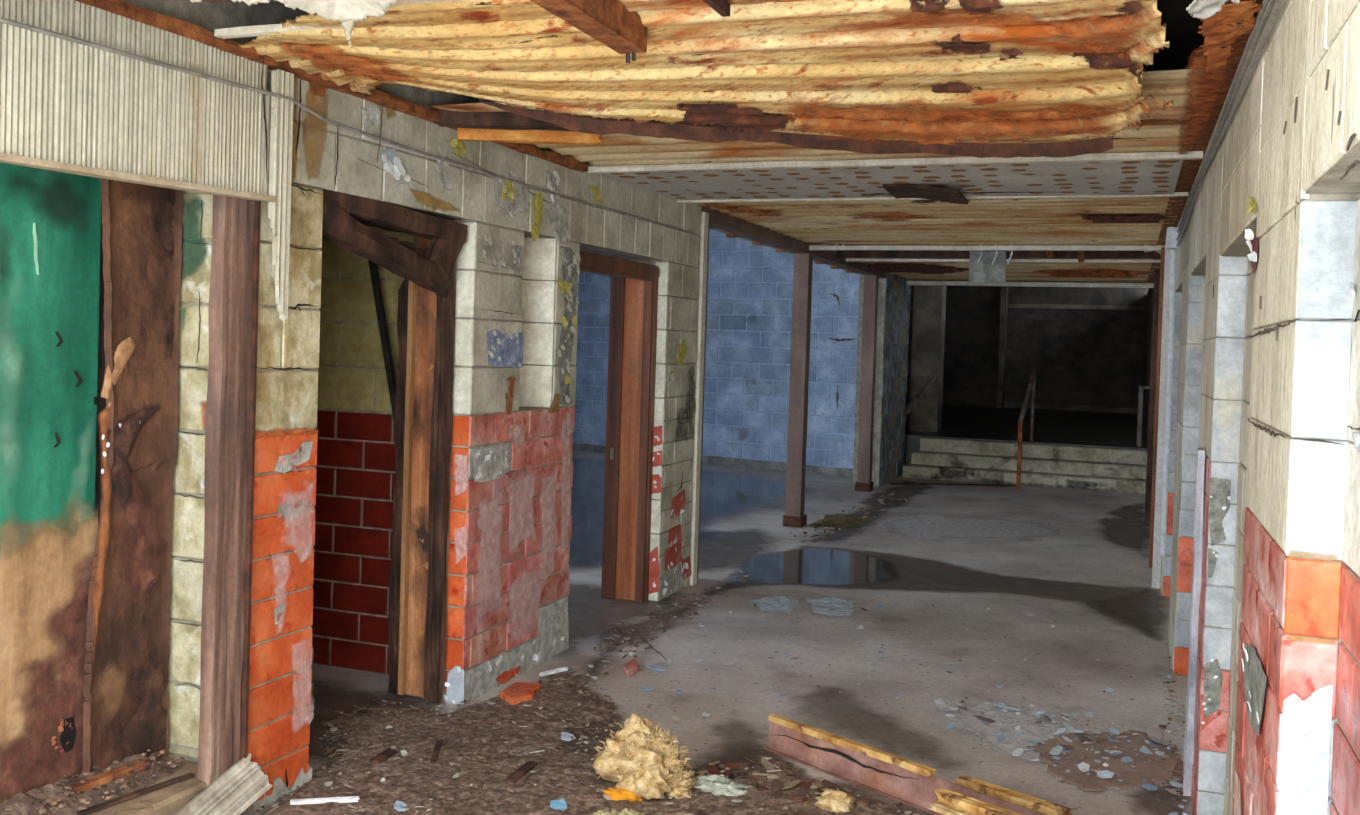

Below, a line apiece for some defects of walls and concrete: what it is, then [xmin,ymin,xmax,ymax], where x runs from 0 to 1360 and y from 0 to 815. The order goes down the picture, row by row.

rust [890,0,1148,77]
rust [281,42,411,99]
rust [677,82,1118,145]
spalling [274,441,313,474]
spalling [472,447,509,483]
crack [1247,418,1360,445]
spalling [277,499,308,520]
spalling [649,426,692,598]
spalling [274,603,285,625]
spalling [444,612,569,705]
spalling [1201,659,1223,729]
spalling [1241,644,1267,736]